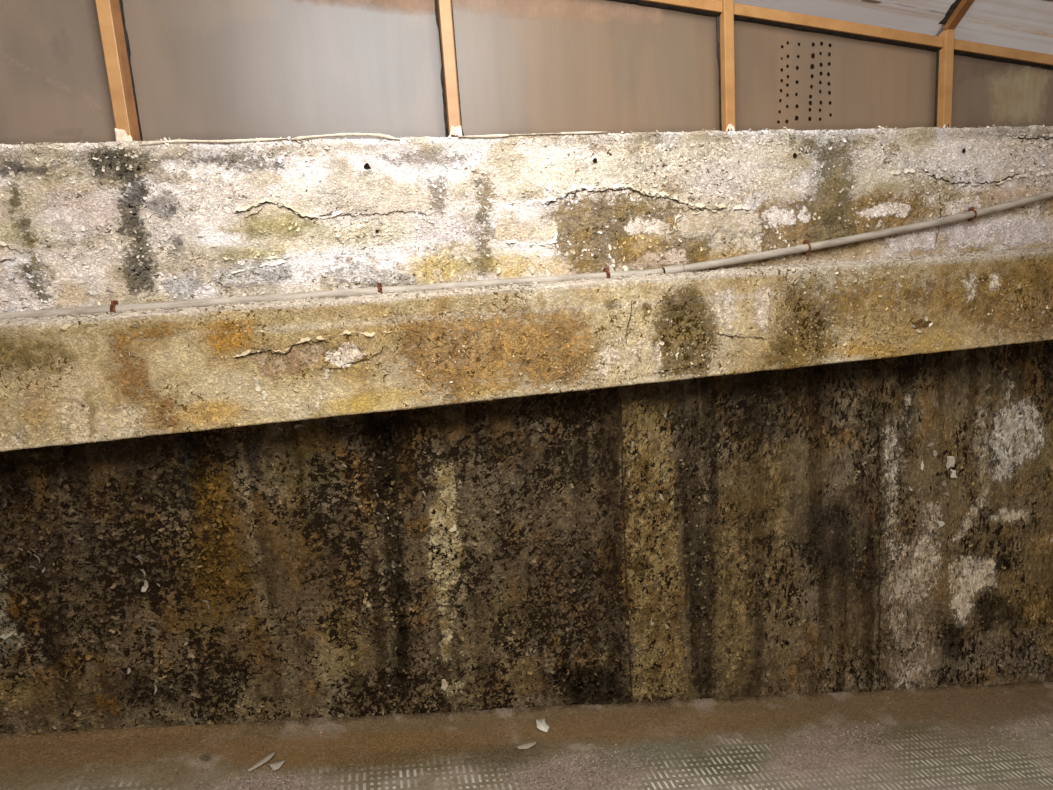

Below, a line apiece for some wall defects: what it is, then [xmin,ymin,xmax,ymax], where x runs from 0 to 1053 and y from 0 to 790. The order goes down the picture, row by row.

damp [0,158,60,177]
damp [75,146,287,295]
crack [237,202,431,222]
crack [541,187,753,212]
crack [235,340,383,380]
damp [642,285,723,380]
peeling [0,125,1053,735]
damp [368,413,412,700]
damp [674,406,756,694]
damp [804,392,943,640]
damp [537,662,625,705]
damp [894,592,1053,690]